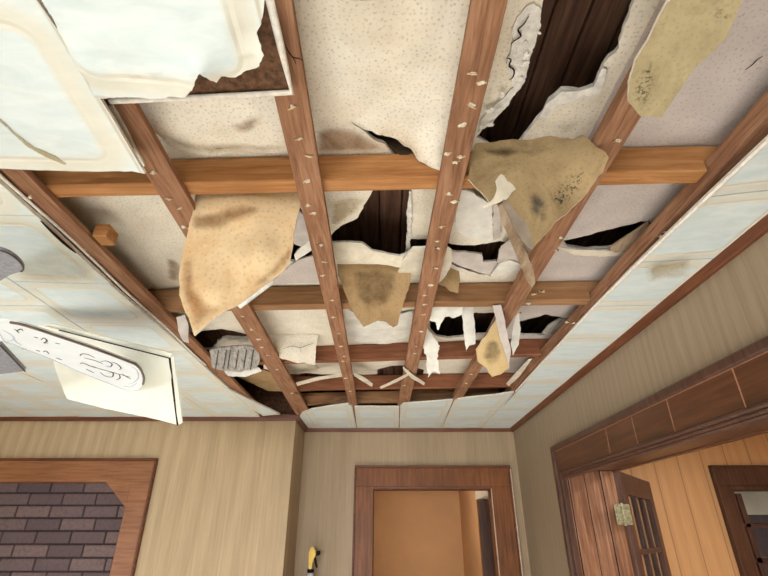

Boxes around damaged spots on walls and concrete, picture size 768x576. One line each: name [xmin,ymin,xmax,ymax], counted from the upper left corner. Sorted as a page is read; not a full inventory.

peeling [42,0,265,99]
flaking render [478,2,542,134]
crack [506,16,529,80]
flaking render [537,68,607,121]